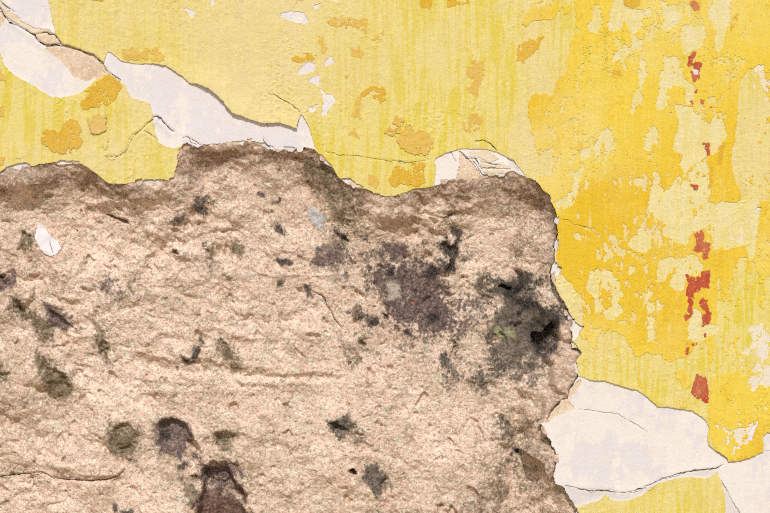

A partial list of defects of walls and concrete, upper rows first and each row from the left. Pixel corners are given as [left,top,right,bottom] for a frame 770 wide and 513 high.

peeling [587,0,651,71]
peeling [0,0,316,151]
peeling [298,62,335,116]
peeling [631,60,648,114]
peeling [753,64,770,101]
water stain [0,163,147,198]
water stain [177,143,371,204]
peeling [641,0,761,342]
water stain [276,177,571,396]
spalling [0,138,770,513]
crack [0,466,122,487]
water stain [152,415,244,490]